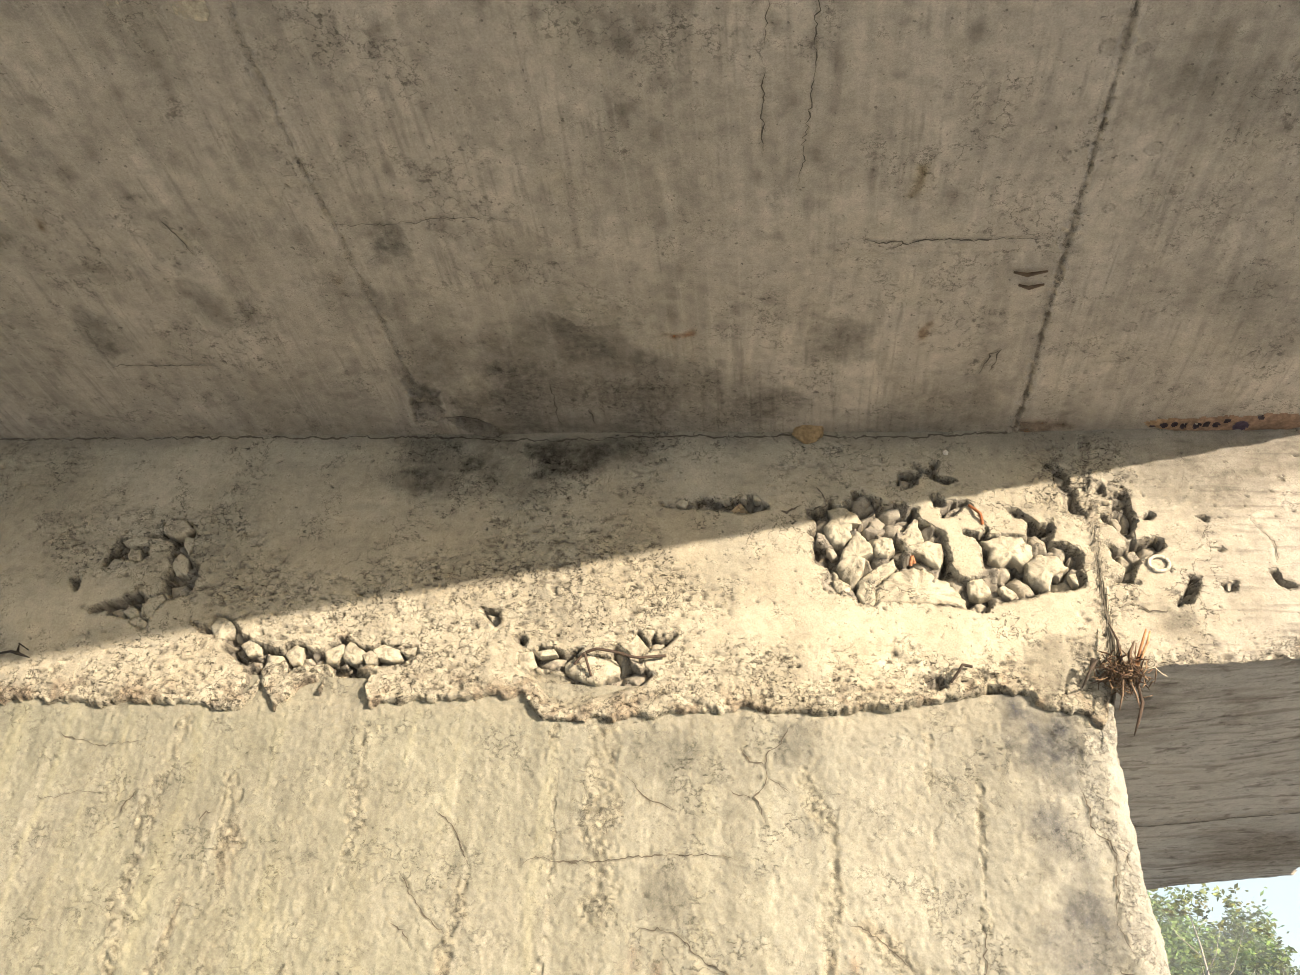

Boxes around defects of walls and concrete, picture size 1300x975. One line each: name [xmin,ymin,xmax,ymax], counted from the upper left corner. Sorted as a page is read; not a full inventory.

crack [797,0,821,184]
crack [852,237,1053,248]
spalling [67,517,201,630]
spalling [658,493,771,515]
spalling [803,459,1168,615]
spalling [1266,567,1300,592]
spalling [187,613,420,701]
spalling [478,606,678,712]
crack [730,729,788,825]
crack [525,853,742,865]
crack [1077,772,1148,975]
crack [635,927,728,975]